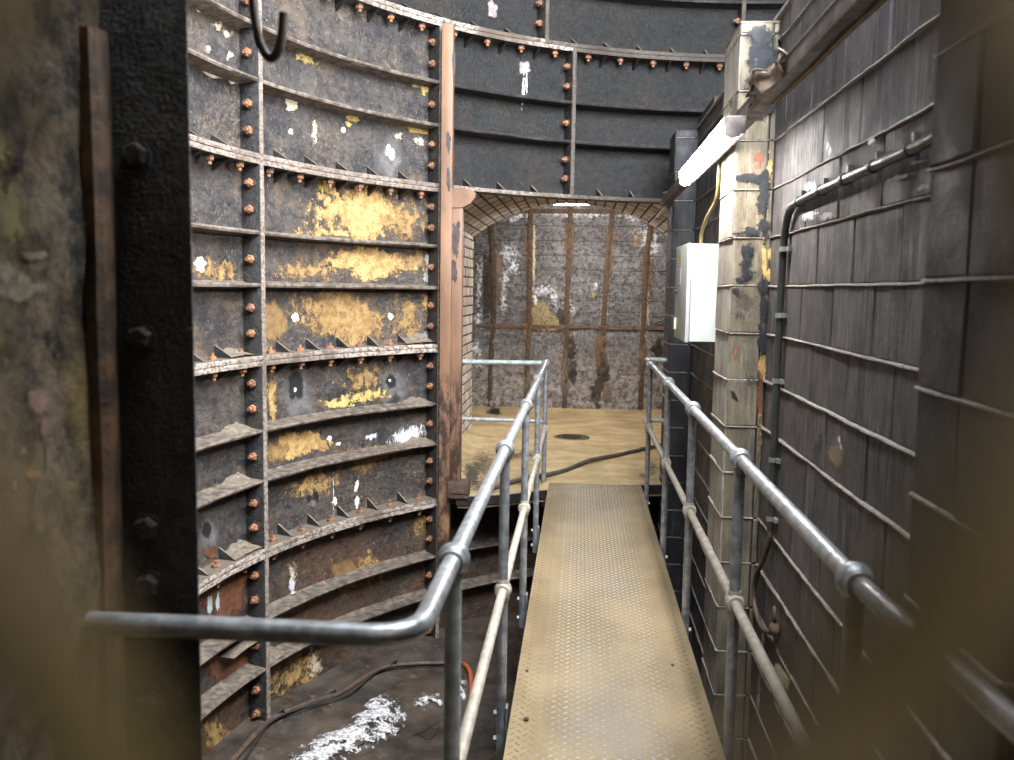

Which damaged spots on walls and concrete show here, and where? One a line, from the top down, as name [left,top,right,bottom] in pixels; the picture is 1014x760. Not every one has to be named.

damp [497,243,522,313]
rust [482,218,574,398]
rust [635,227,654,385]
damp [387,425,427,444]
rust [199,570,248,617]
damp [291,693,443,760]